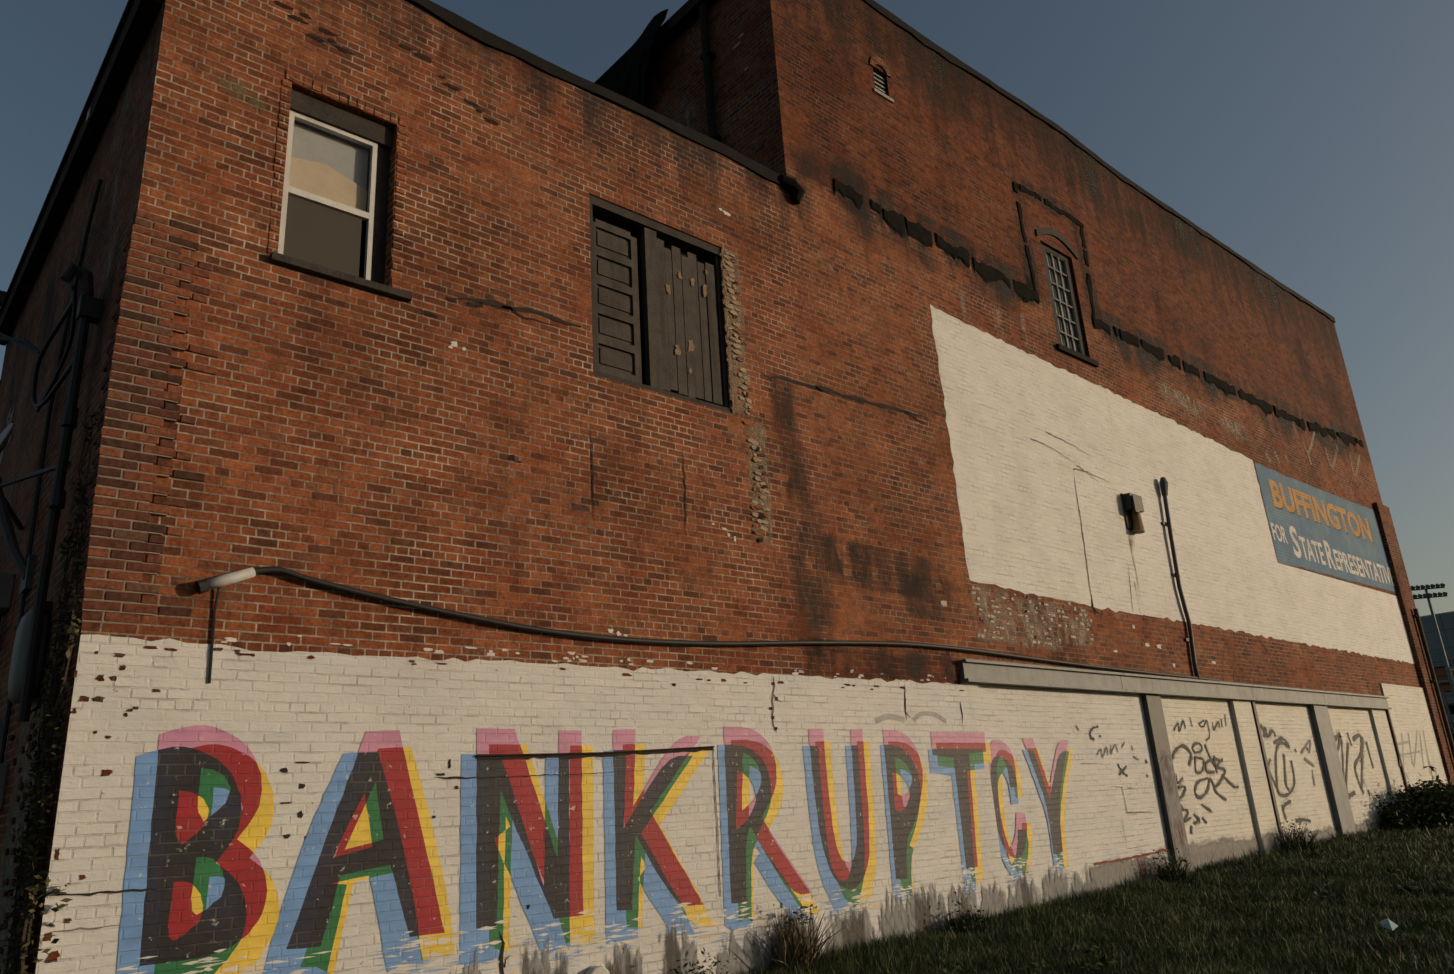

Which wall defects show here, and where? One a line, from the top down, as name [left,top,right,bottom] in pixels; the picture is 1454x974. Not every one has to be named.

crack [452,297,583,327]
crack [760,372,928,426]
peeling [970,586,1094,647]
peeling [213,637,255,657]
peeling [72,651,126,714]
peeling [834,669,964,691]